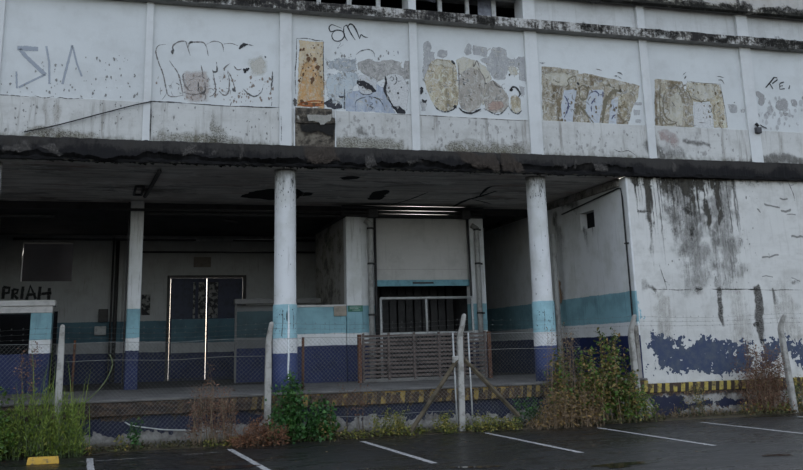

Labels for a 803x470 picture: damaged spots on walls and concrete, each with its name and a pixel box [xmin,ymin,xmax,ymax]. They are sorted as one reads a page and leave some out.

leakage [719,0,803,15]
leakage [760,38,803,51]
peeling [544,84,638,162]
leakage [630,177,757,263]
leakage [753,285,764,343]
peeling [645,329,803,380]